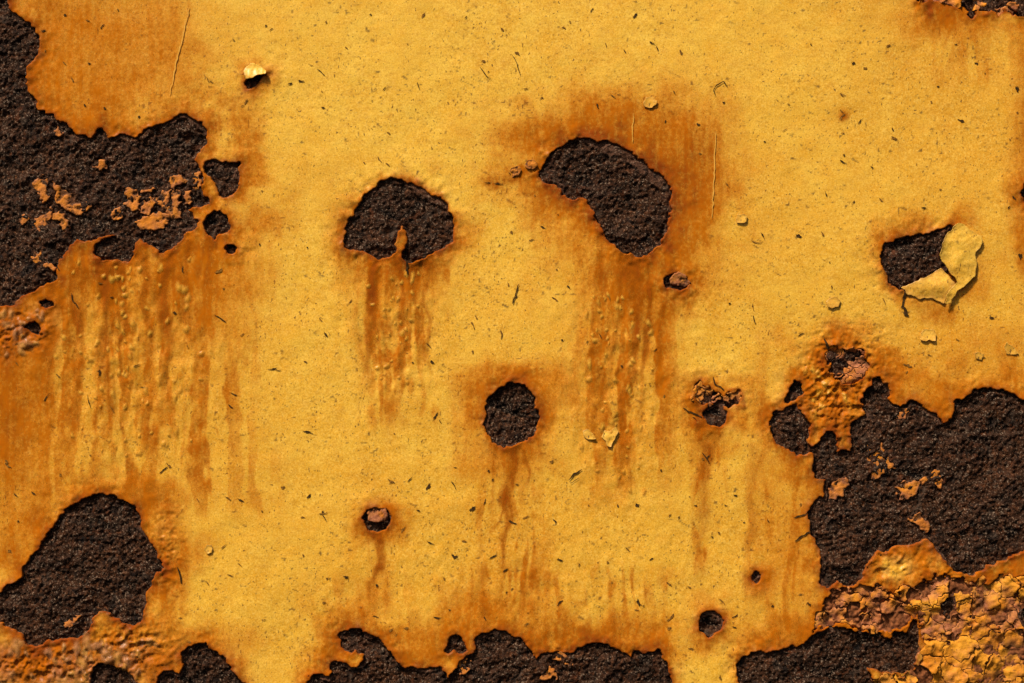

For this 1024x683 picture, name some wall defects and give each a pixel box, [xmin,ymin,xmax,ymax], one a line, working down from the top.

peeling [0,0,241,308]
rust [0,0,270,683]
peeling [344,157,454,263]
rust [334,175,465,412]
peeling [483,382,540,448]
peeling [485,138,672,257]
rust [485,93,1024,683]
peeling [880,223,983,304]
peeling [0,494,164,646]
peeling [307,613,672,683]
peeling [699,599,738,638]
peeling [736,346,1024,683]